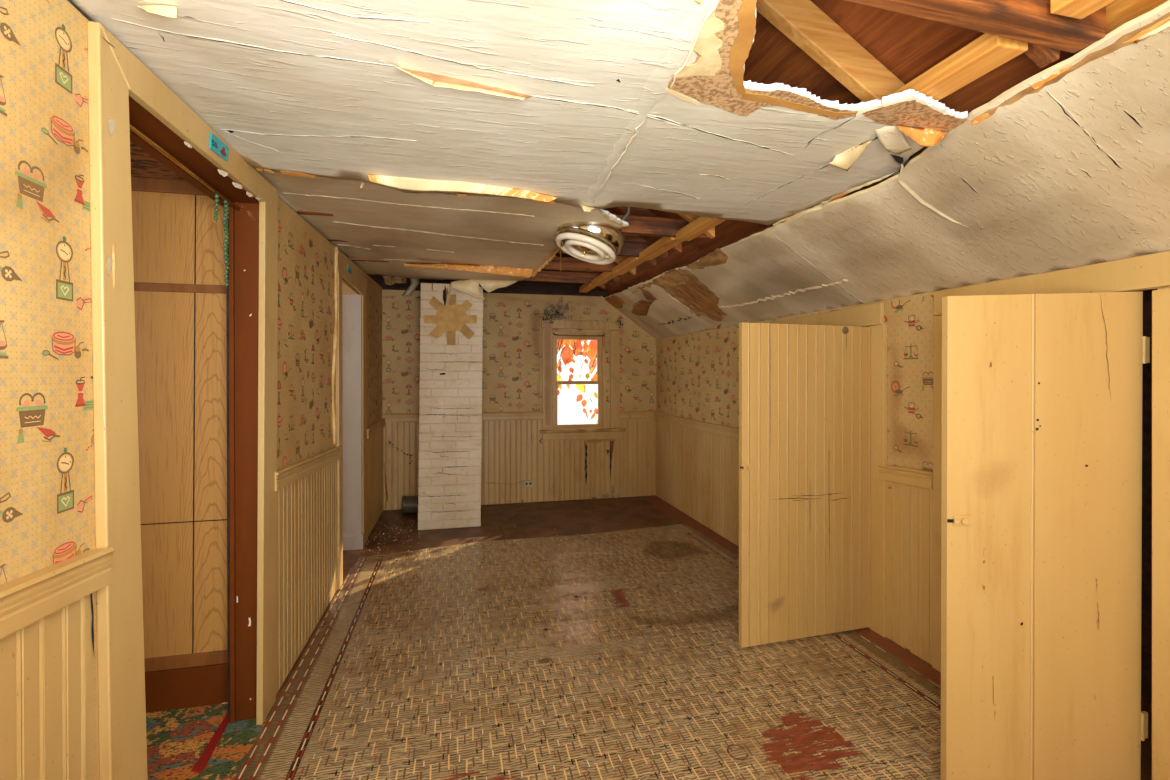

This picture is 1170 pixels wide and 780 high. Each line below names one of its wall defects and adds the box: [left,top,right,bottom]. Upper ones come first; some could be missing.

crack [101,0,862,205]
crack [285,193,540,263]
peeling [383,262,533,296]
peeling [606,248,728,329]